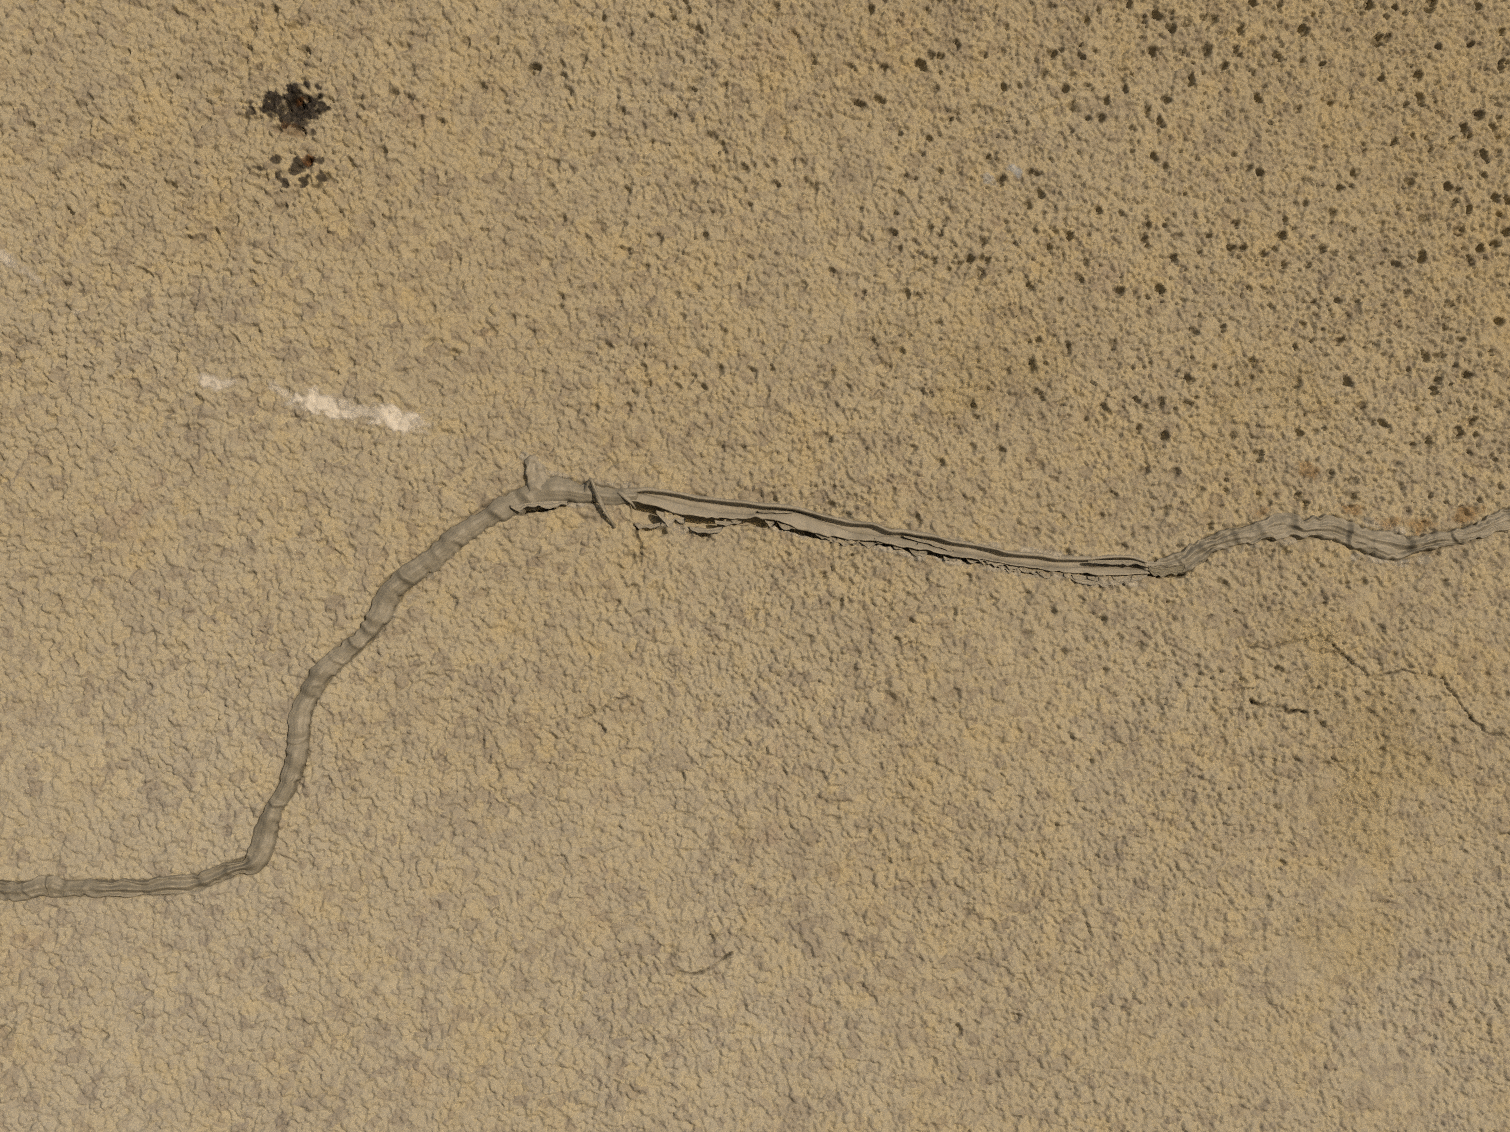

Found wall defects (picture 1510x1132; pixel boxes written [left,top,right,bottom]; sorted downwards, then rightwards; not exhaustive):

crack [0,451,1510,905]